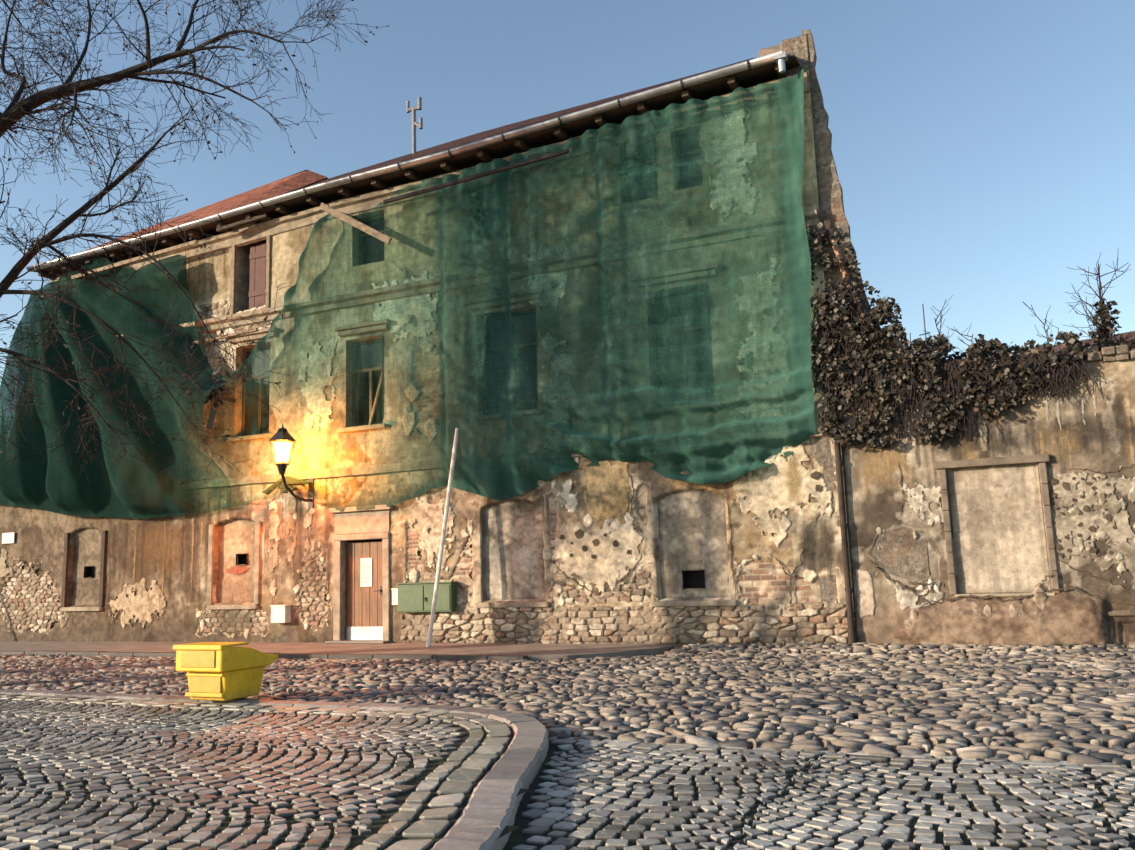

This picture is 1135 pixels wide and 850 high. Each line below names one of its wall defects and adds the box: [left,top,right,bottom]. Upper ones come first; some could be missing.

spalling [0,548,69,637]
flaking render [107,577,166,630]
spalling [400,497,477,609]
flaking render [539,341,659,609]
flaking render [730,437,945,619]
flaking render [1050,466,1135,590]